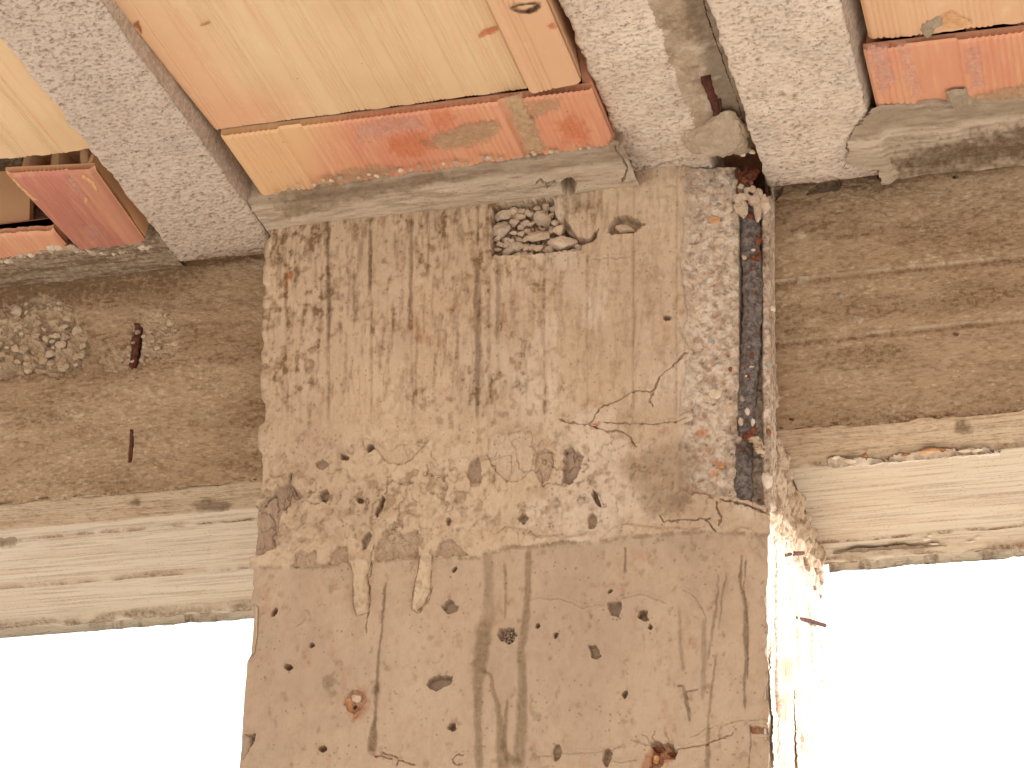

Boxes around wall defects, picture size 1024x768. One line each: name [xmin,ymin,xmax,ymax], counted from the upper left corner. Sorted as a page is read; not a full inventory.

corrosion [701,74,723,117]
corrosion [733,167,771,223]
corrosion [128,323,145,370]
spalling [659,146,796,512]
crack [556,348,693,451]
corrosion [125,427,136,465]
peeling [313,434,448,480]
peeling [463,428,588,487]
crack [748,436,780,466]
spalling [253,484,332,557]
hole [584,487,605,531]
hole [605,586,656,632]